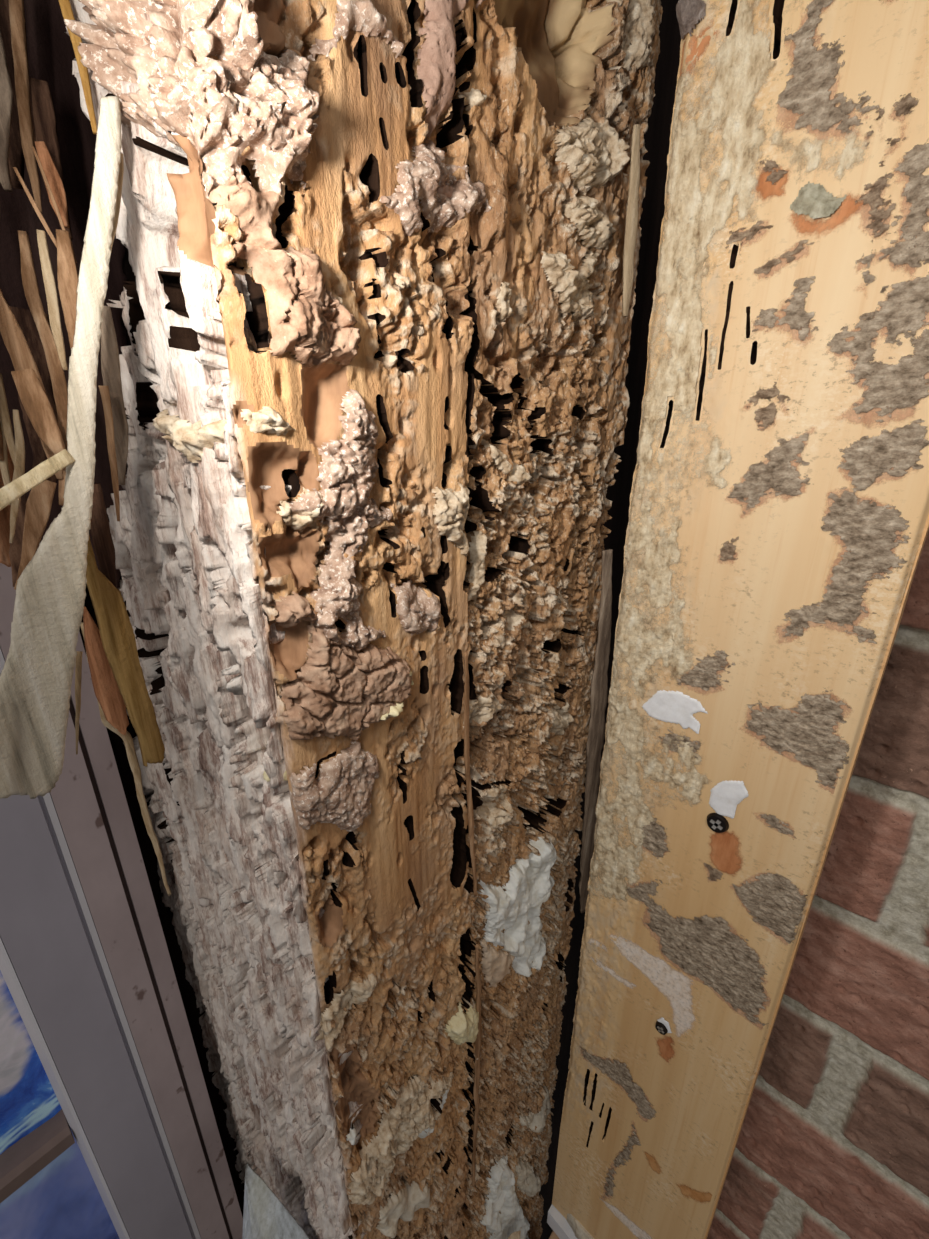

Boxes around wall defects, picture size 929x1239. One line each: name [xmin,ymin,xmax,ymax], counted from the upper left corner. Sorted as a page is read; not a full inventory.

crack [726,0,738,36]
crack [772,0,785,59]
crack [660,244,758,450]
corrosion [710,832,742,874]
crack [583,1069,612,1148]